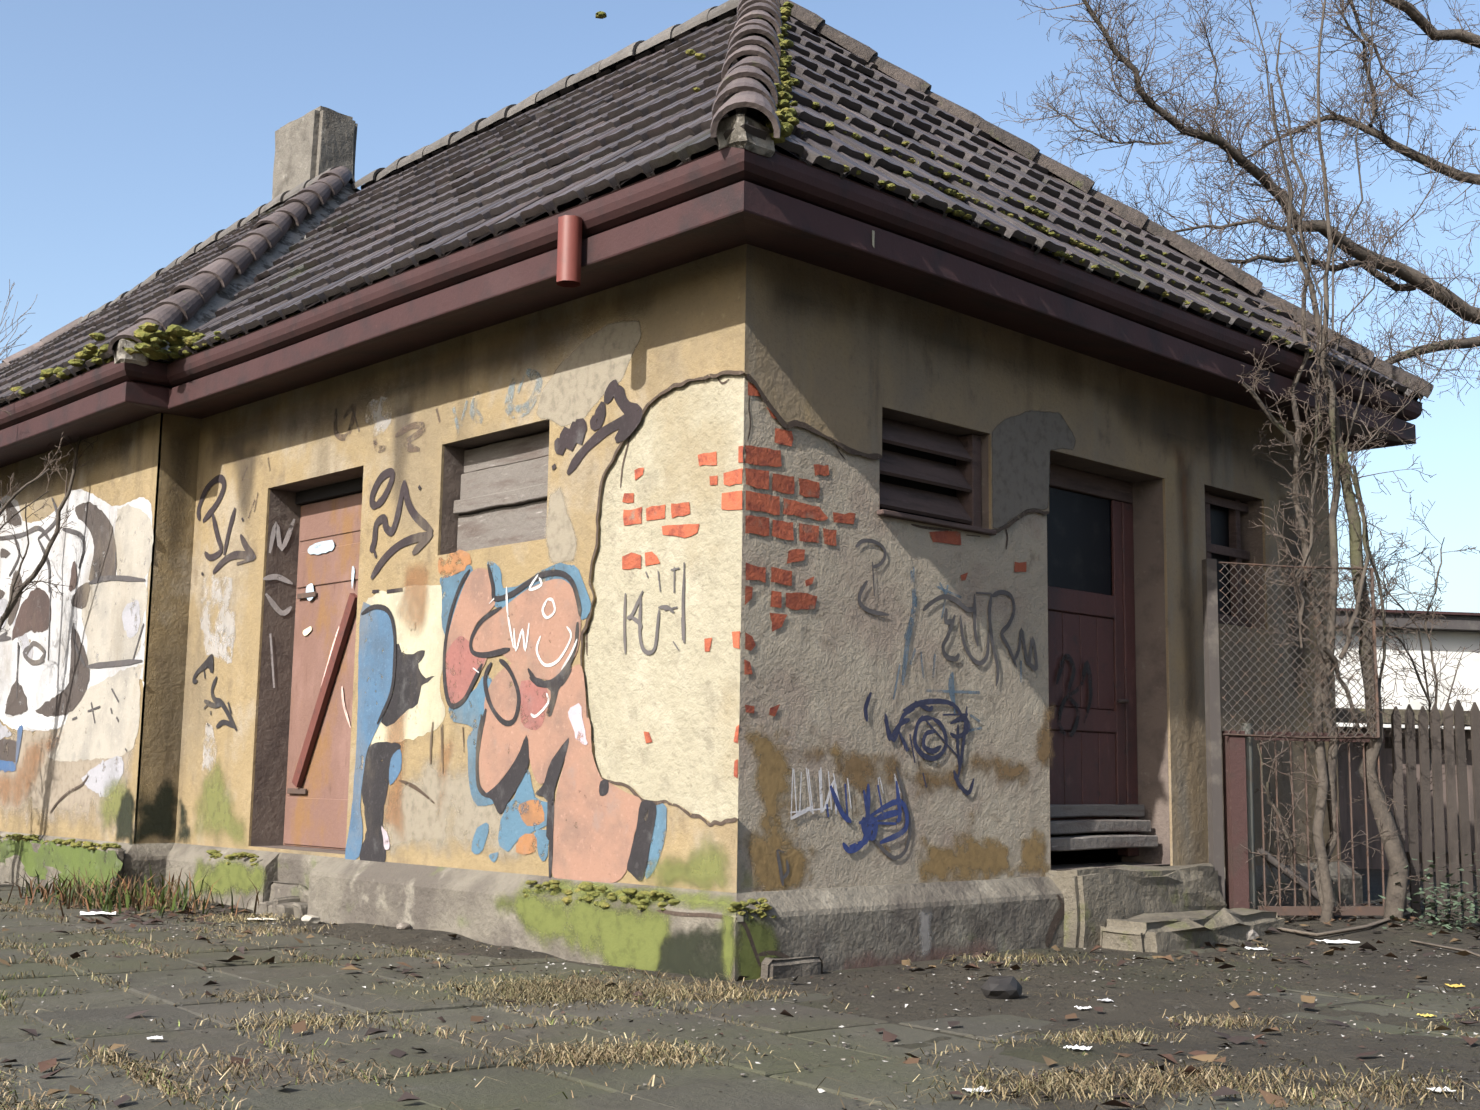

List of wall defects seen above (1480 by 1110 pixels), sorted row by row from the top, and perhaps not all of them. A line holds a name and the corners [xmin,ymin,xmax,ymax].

flaking render [584,374,1054,893]
damp [658,928,726,981]
spalling [761,956,823,980]